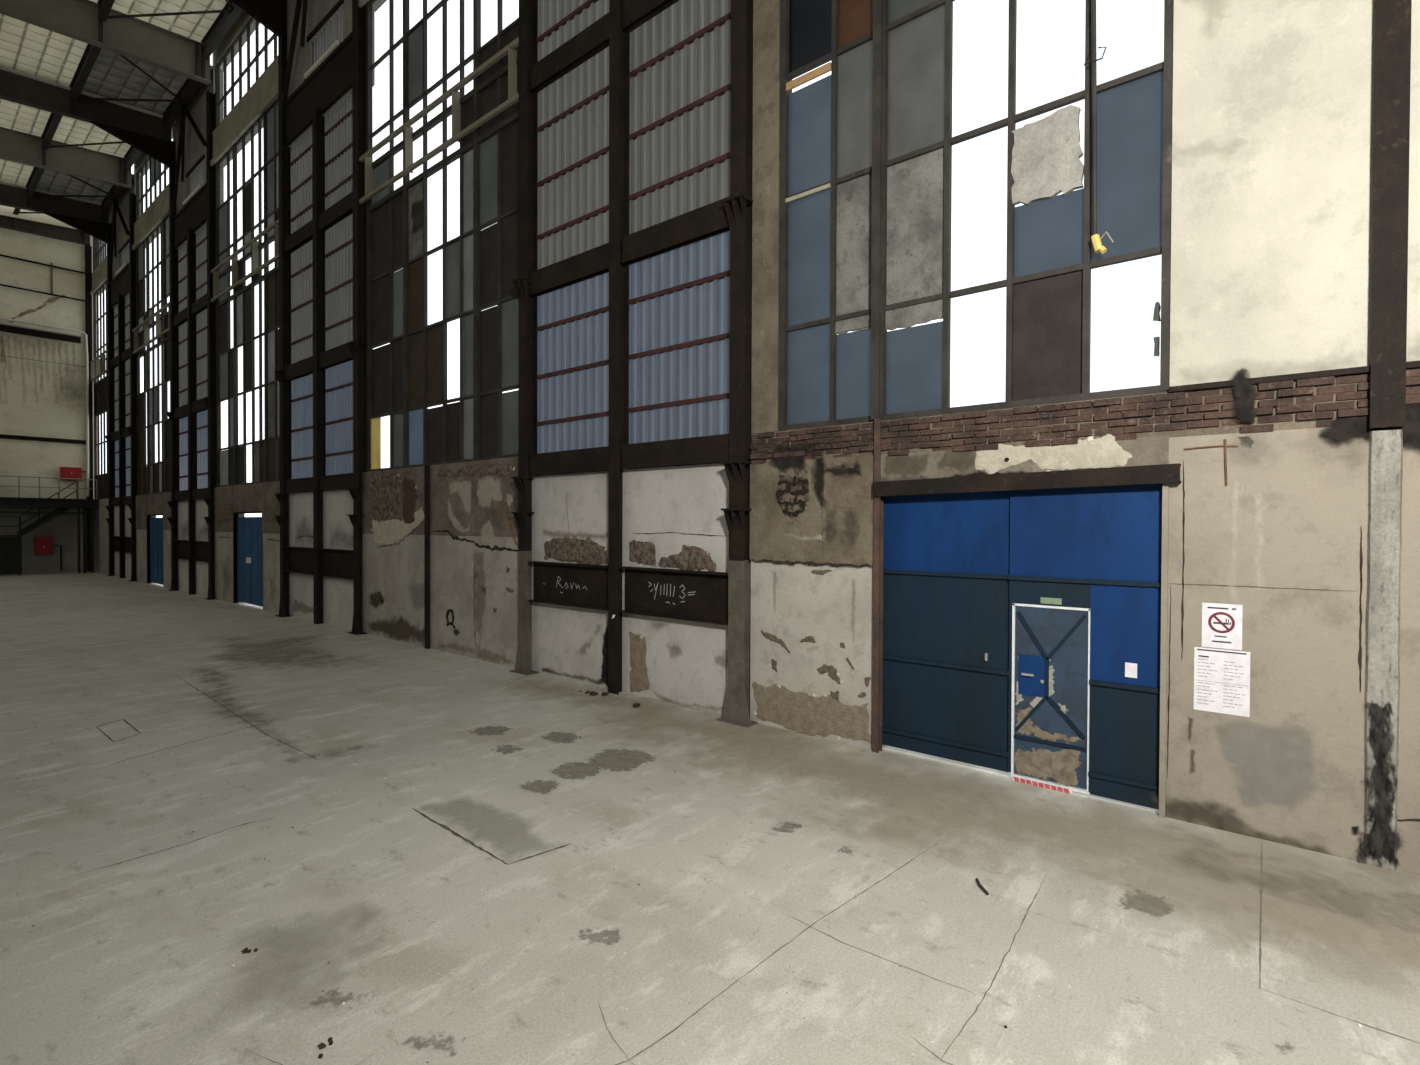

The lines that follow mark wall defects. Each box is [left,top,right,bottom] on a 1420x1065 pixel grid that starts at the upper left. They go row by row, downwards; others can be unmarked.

peeling [975,434,1132,474]
peeling [371,477,424,545]
peeling [448,478,513,543]
spalling [544,537,608,565]
spalling [629,539,716,572]
peeling [752,630,872,744]
crack [598,838,1046,1065]